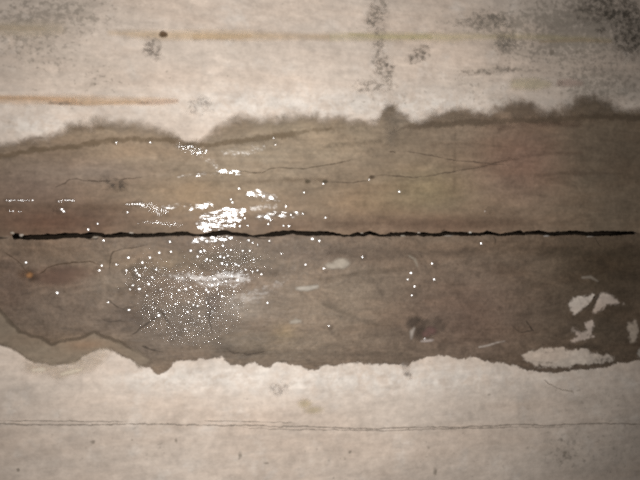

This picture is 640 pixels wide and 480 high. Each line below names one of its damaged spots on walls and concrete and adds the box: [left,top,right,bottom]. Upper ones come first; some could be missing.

crack [0,229,636,274]
water stain [0,96,640,375]